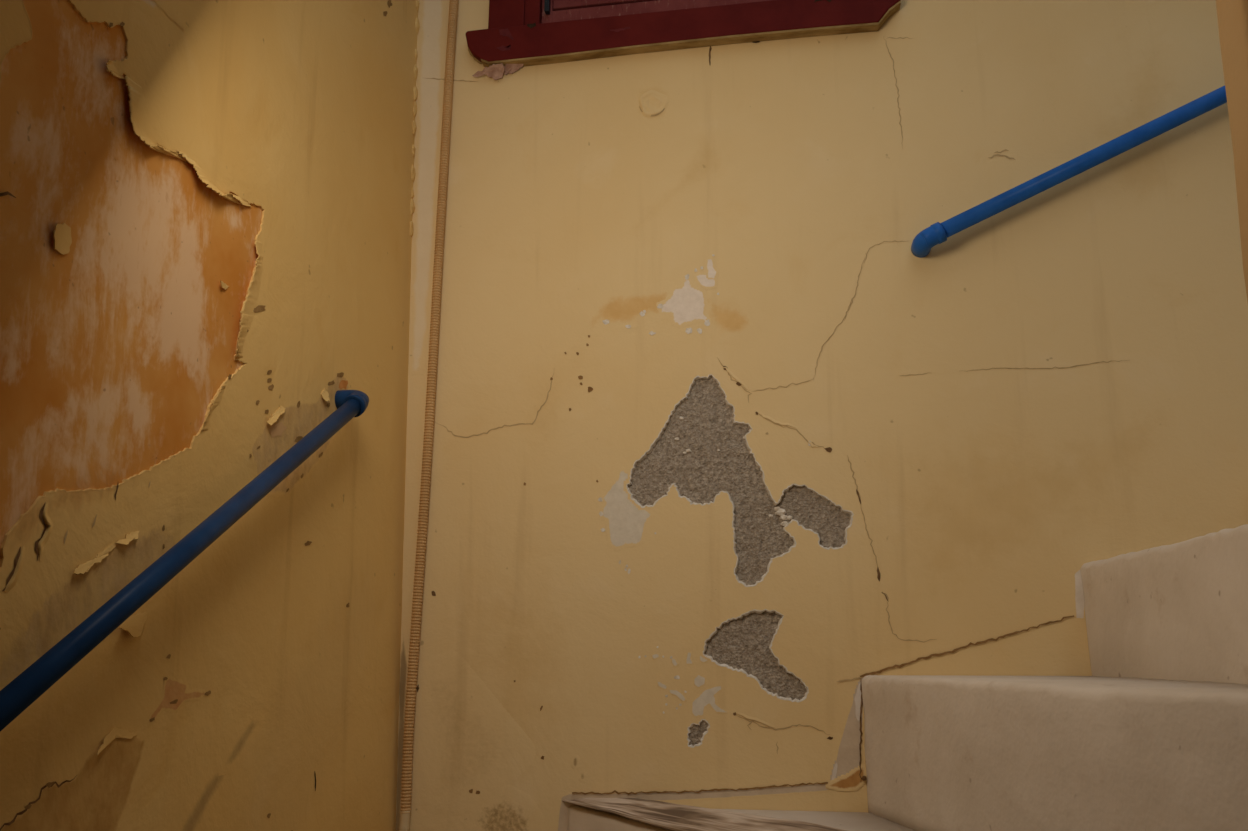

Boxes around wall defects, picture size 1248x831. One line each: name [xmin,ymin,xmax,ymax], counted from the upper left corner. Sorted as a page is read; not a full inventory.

crack [883,37,912,146]
peeling [0,0,266,691]
peeling [250,370,351,477]
peeling [267,430,340,498]
crack [435,374,554,438]
peeling [625,254,719,334]
spalling [598,374,854,587]
crack [718,241,937,642]
crack [962,360,1127,372]
spalling [638,609,809,748]
peeling [0,721,148,831]